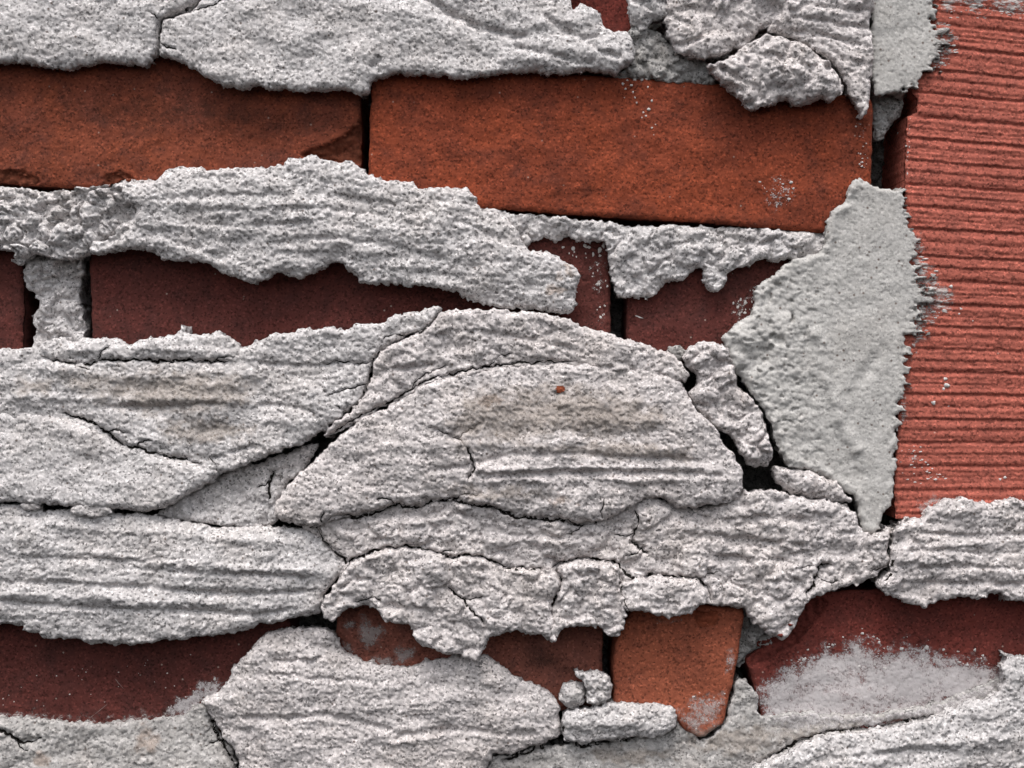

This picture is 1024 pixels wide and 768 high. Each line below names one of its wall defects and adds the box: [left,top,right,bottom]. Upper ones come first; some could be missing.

spalling [304,119,361,164]
spalling [0,169,38,187]
spalling [101,171,133,187]
crack [42,347,231,370]
crack [315,311,577,444]
crack [59,412,217,471]
crack [258,471,275,500]
crack [310,427,718,624]
crack [802,563,838,596]
crack [870,547,895,581]
spalling [747,600,826,664]
efflorescence [758,628,1000,733]